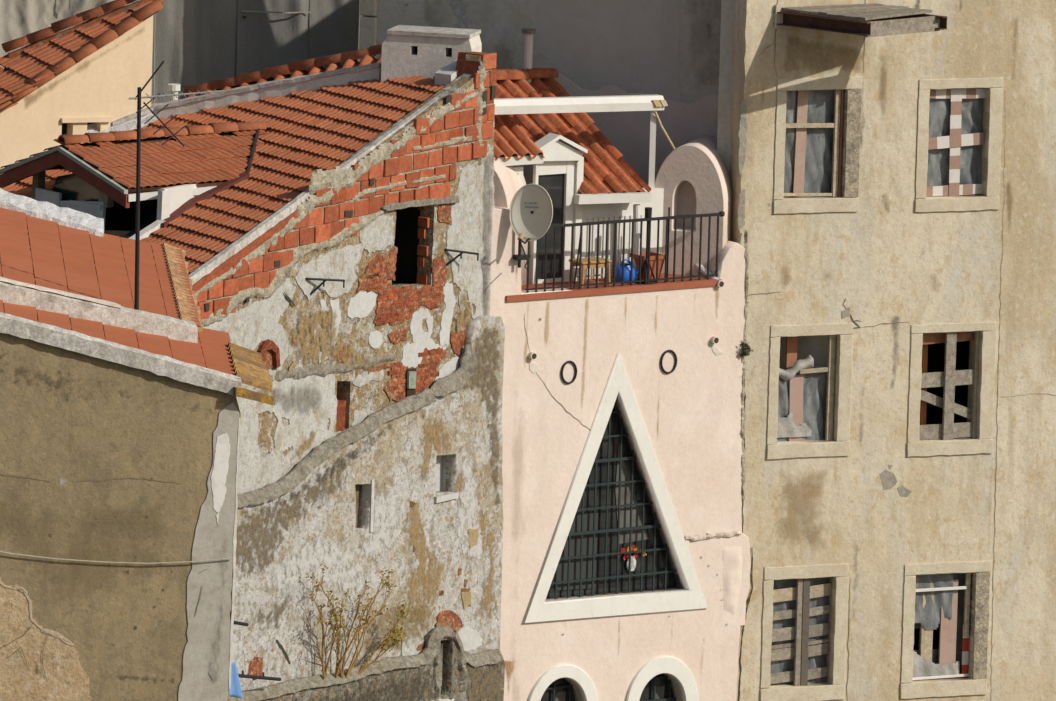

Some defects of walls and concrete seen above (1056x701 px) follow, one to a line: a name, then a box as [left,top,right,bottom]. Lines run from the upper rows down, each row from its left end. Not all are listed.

flaking render [196,53,497,689]
crack [524,313,591,431]
flaking render [0,577,93,701]
crack [844,579,852,701]